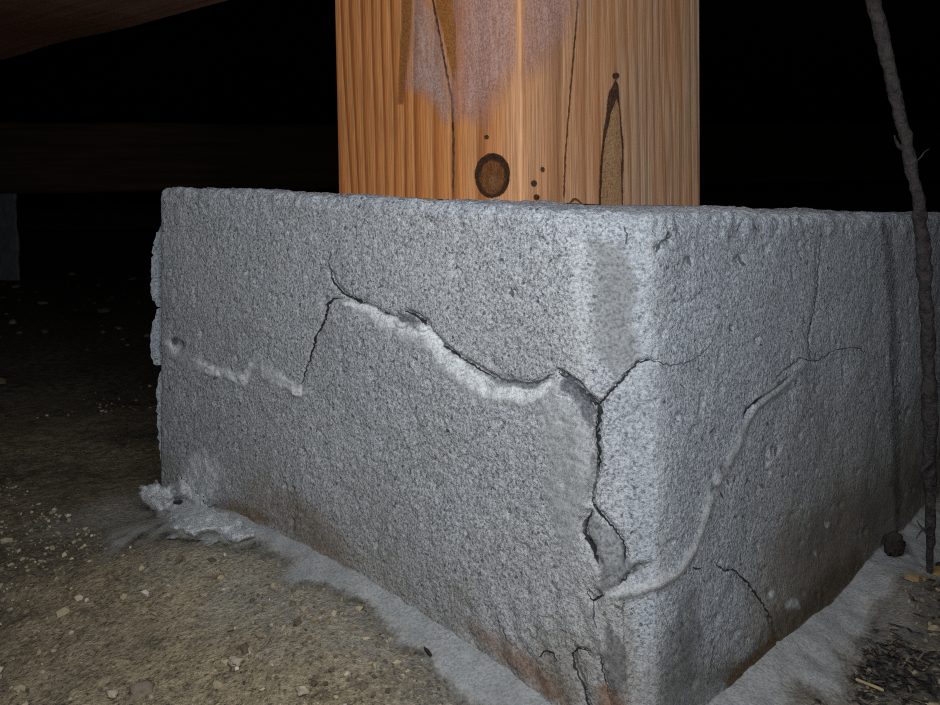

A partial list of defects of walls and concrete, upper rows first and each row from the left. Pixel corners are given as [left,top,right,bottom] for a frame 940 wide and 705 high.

water stain [398,0,511,112]
crack [744,226,866,414]
crack [301,251,712,628]
crack [693,563,773,627]
crack [539,647,612,705]